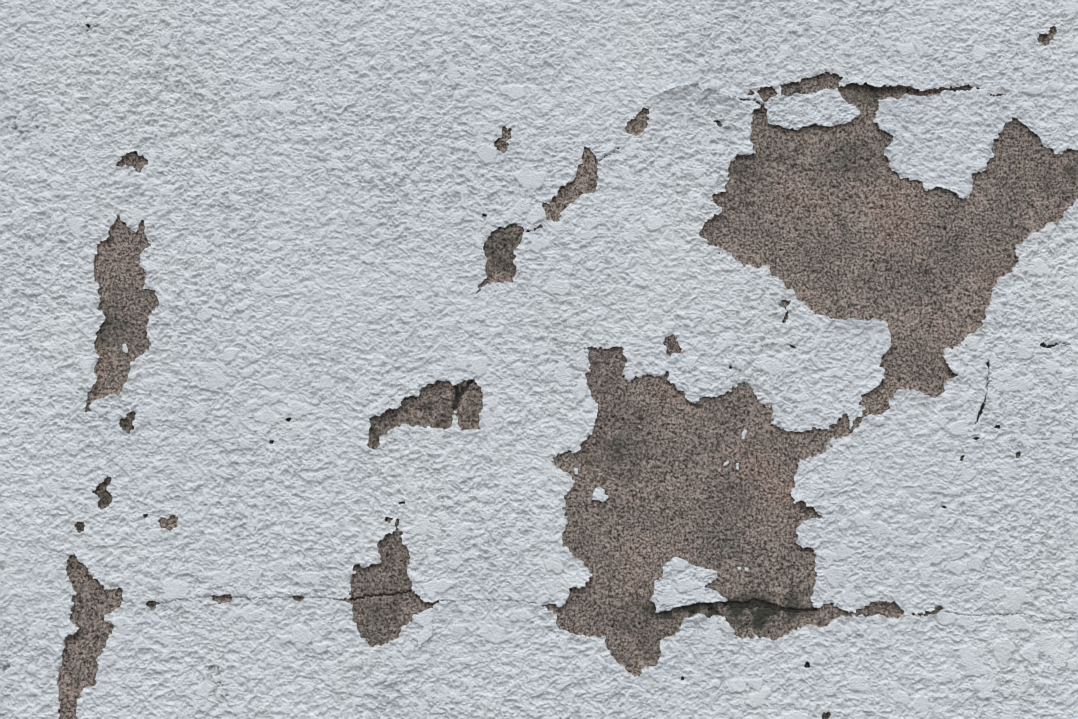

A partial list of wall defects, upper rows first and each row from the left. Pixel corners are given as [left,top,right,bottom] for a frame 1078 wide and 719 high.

spalling [116,151,148,173]
spalling [476,146,599,294]
spalling [84,215,159,413]
spalling [367,379,483,450]
spalling [542,71,1078,677]
crack [975,363,989,424]
spalling [57,554,123,719]
spalling [339,517,439,648]